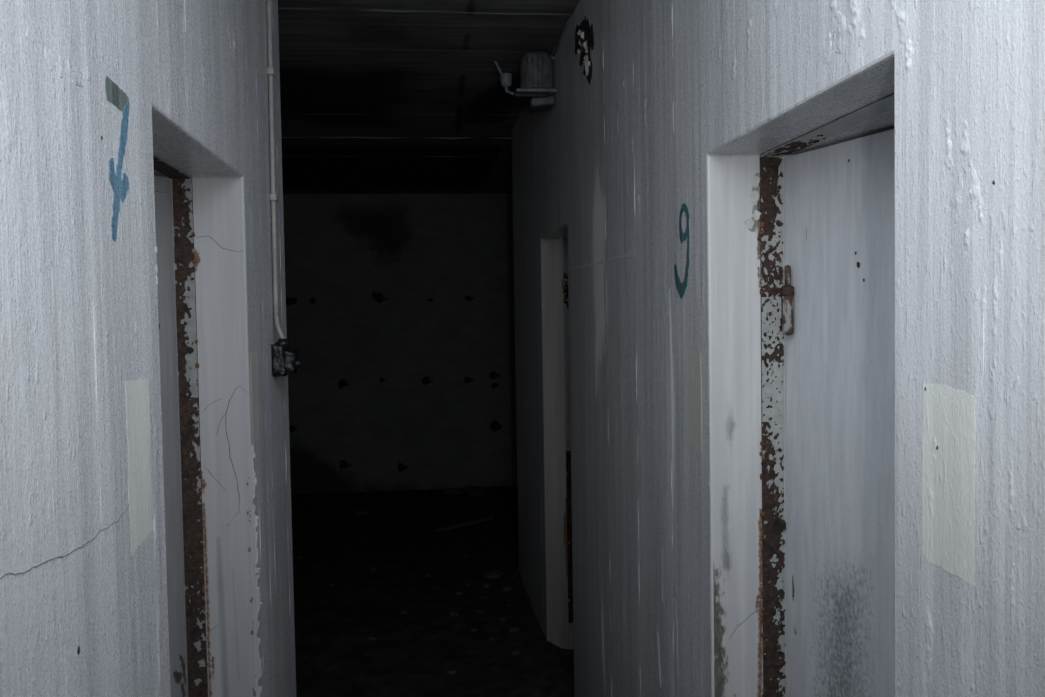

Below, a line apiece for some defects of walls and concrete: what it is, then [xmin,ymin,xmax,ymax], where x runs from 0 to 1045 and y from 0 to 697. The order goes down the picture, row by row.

crack [0,505,129,579]
corrosion [153,156,214,697]
peeling [744,173,761,242]
corrosion [756,135,826,697]